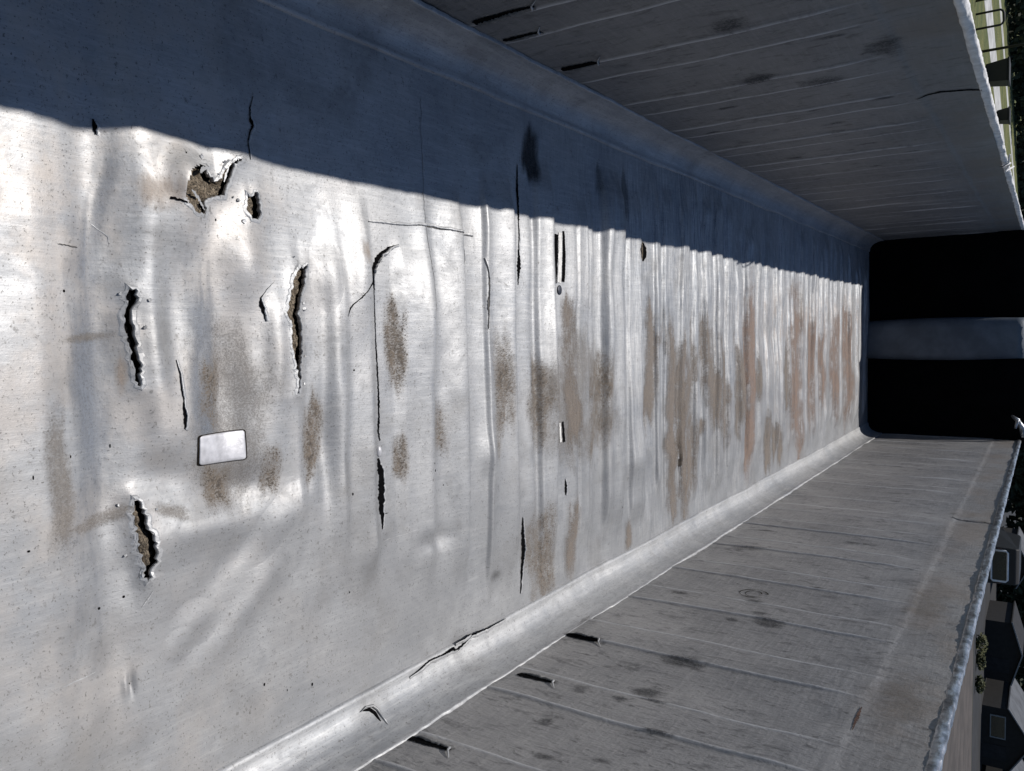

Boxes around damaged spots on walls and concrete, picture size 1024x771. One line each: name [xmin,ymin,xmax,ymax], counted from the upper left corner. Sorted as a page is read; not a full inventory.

crack [248,96,257,160]
crack [919,89,982,99]
crack [514,164,522,285]
crack [176,359,190,431]
crack [348,219,491,529]
corrosion [493,293,617,461]
corrosion [643,285,854,526]
crack [519,517,527,594]
corrosion [521,502,580,600]
crack [410,618,506,679]